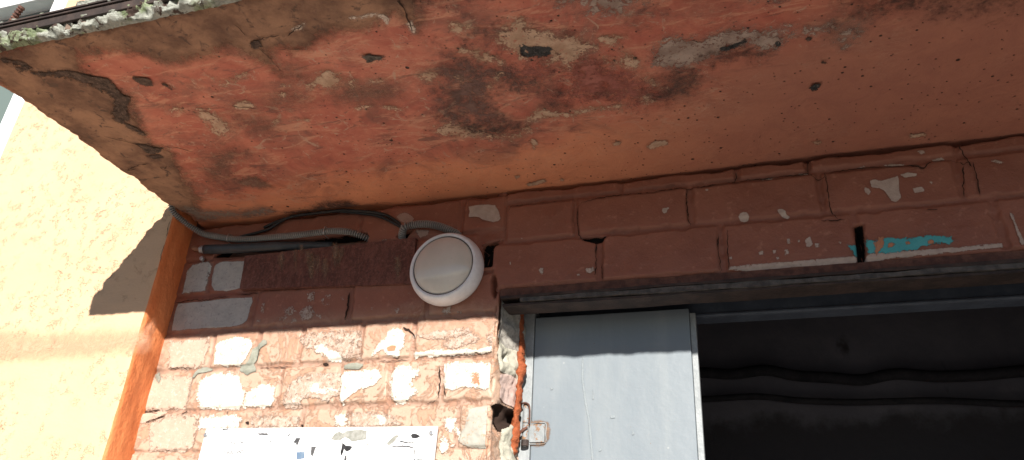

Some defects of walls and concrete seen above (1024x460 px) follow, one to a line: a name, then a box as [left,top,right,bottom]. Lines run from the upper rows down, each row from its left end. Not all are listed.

peeling [0,0,421,212]
damp [432,54,535,138]
peeling [459,16,872,105]
peeling [469,204,500,222]
crack [509,146,980,274]
peeling [729,235,1003,271]
peeling [864,164,932,202]
peeling [140,261,526,460]